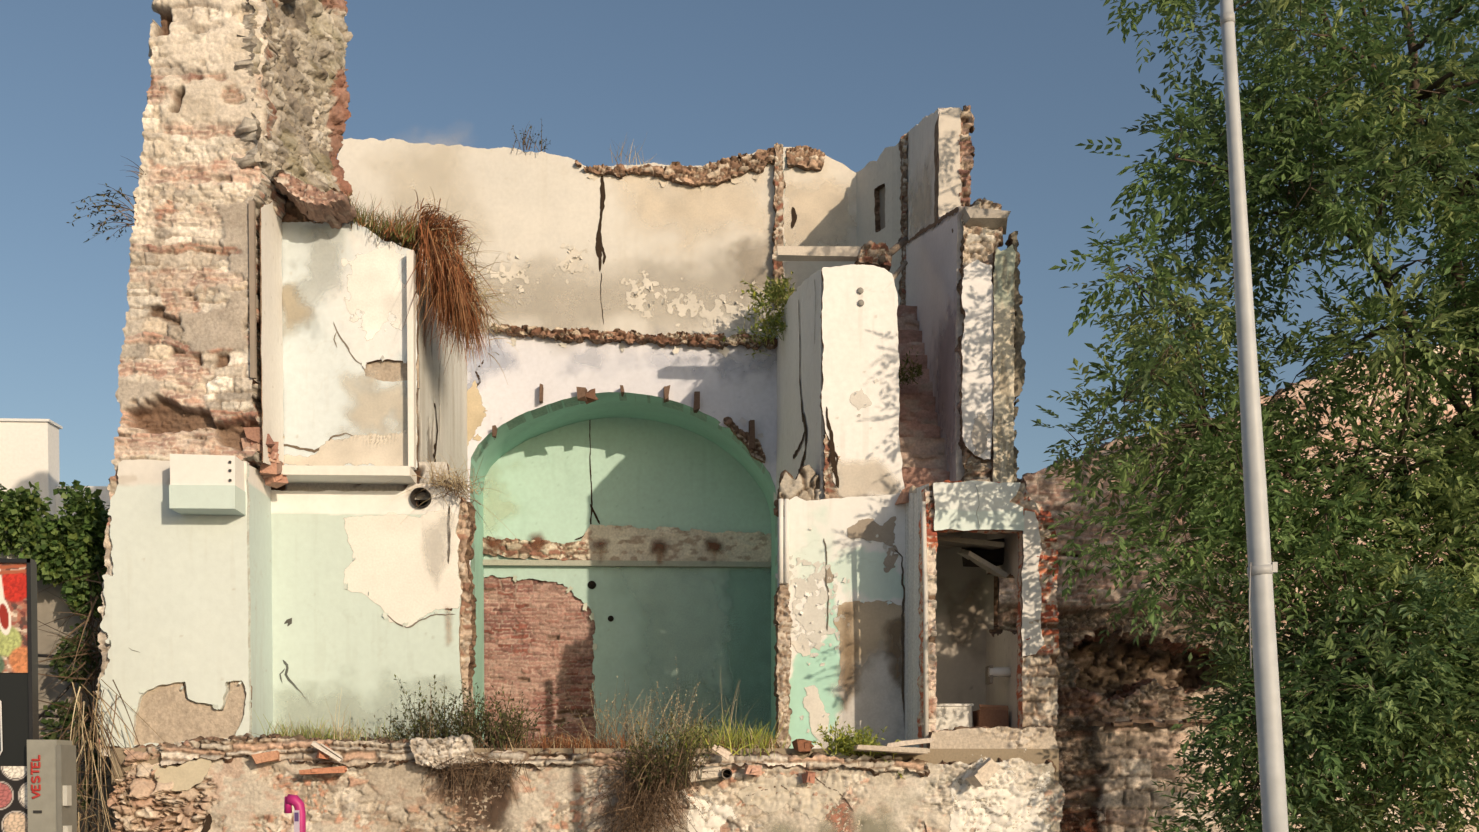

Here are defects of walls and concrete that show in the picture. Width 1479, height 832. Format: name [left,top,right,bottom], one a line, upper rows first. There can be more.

peeling [341,241,419,341]
peeling [486,240,590,305]
crack [595,176,606,324]
spalling [491,270,778,358]
flaking render [362,354,419,389]
crack [575,421,600,540]
peeling [343,510,463,628]
flaking render [132,681,252,745]
flaking render [483,516,905,748]
spalling [744,765,762,775]
peeling [792,685,830,784]
damp [823,610,905,749]